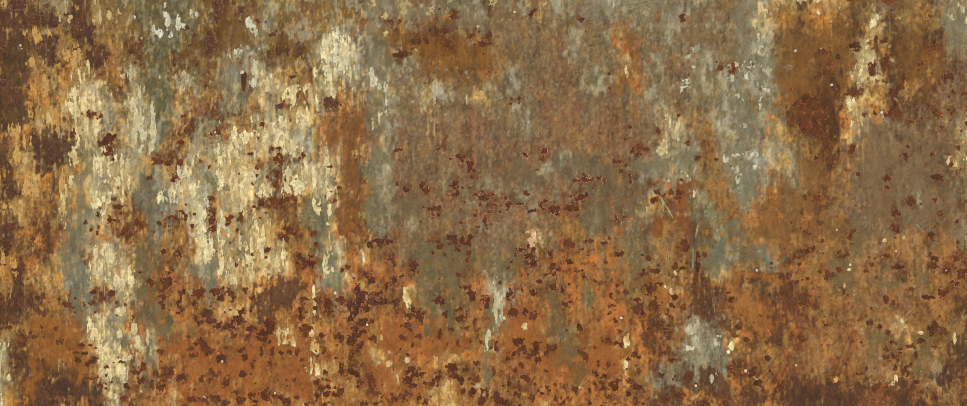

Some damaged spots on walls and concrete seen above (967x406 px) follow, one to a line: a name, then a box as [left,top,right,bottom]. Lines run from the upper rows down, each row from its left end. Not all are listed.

rust [384,7,493,81]
rust [0,0,111,202]
rust [779,35,967,167]
rust [81,109,120,169]
peeling [154,16,356,316]
peeling [403,286,411,311]
rust [0,145,967,406]
peeling [274,327,296,347]
peeling [306,329,321,377]